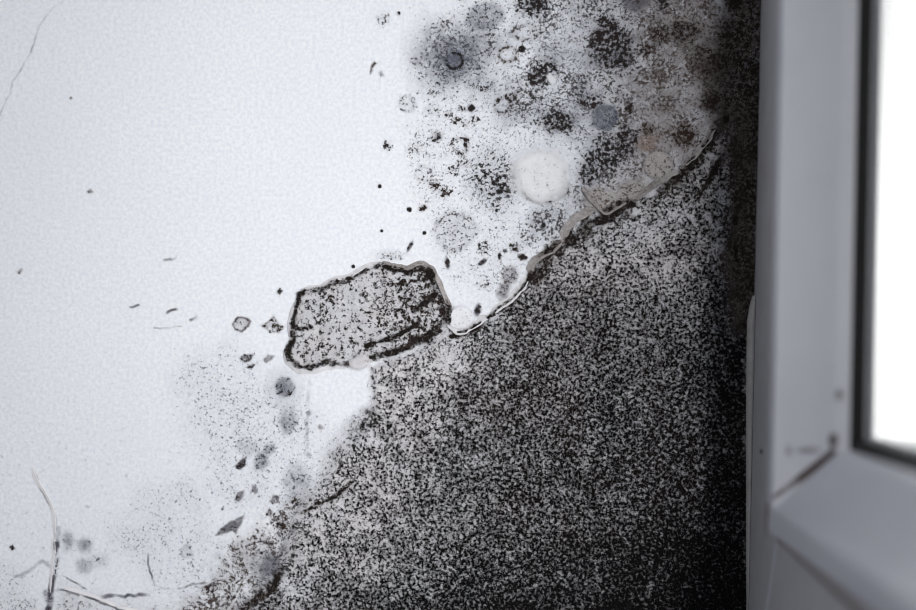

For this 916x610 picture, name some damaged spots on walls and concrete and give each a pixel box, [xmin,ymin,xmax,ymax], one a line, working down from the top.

leakage [378,0,761,335]
leakage [178,347,320,514]
spalling [180,113,756,610]
crack [32,467,59,610]
peeling [62,581,144,610]
leakage [121,515,225,593]